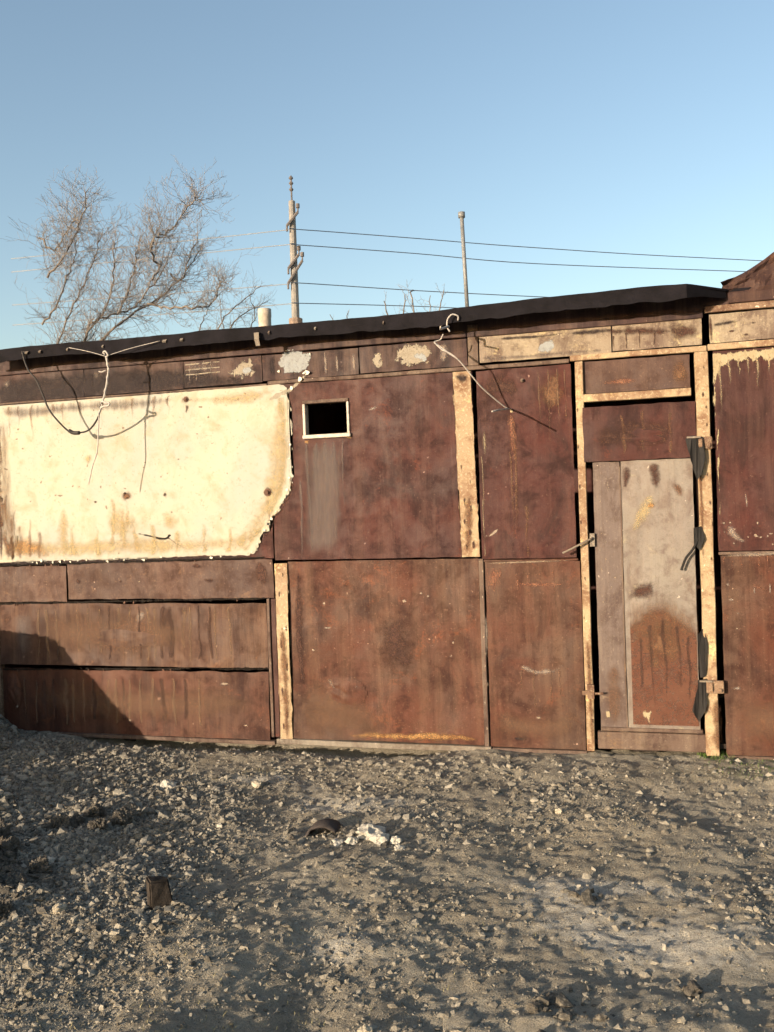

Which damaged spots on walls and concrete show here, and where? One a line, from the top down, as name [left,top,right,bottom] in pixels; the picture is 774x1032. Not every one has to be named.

rust [0,370,238,403]
peeling [395,343,446,367]
peeling [713,348,774,416]
peeling [2,349,311,565]
rust [650,464,659,485]
rust [0,482,266,584]
rust [634,584,652,597]
rust [1,597,269,671]
rust [280,576,305,731]
rust [630,610,699,726]